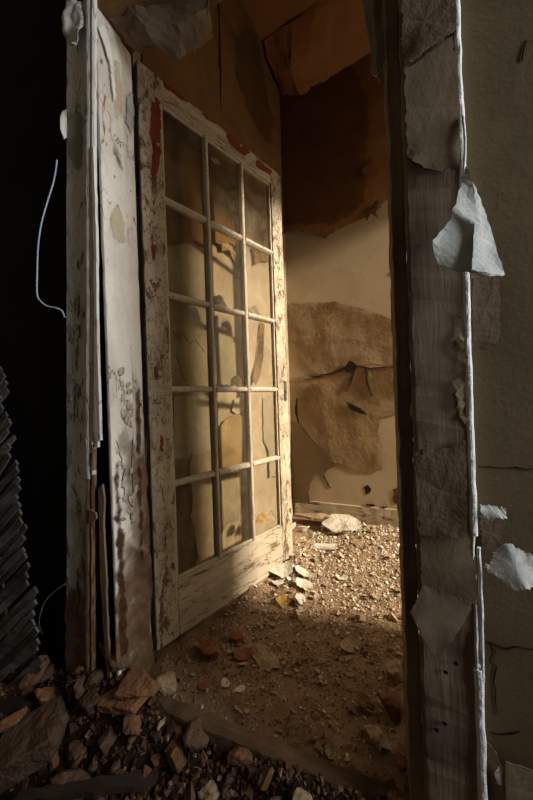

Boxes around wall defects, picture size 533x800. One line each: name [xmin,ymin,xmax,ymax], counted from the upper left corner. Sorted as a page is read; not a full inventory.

flaking render [344,361,357,373]
crack [479,464,533,472]